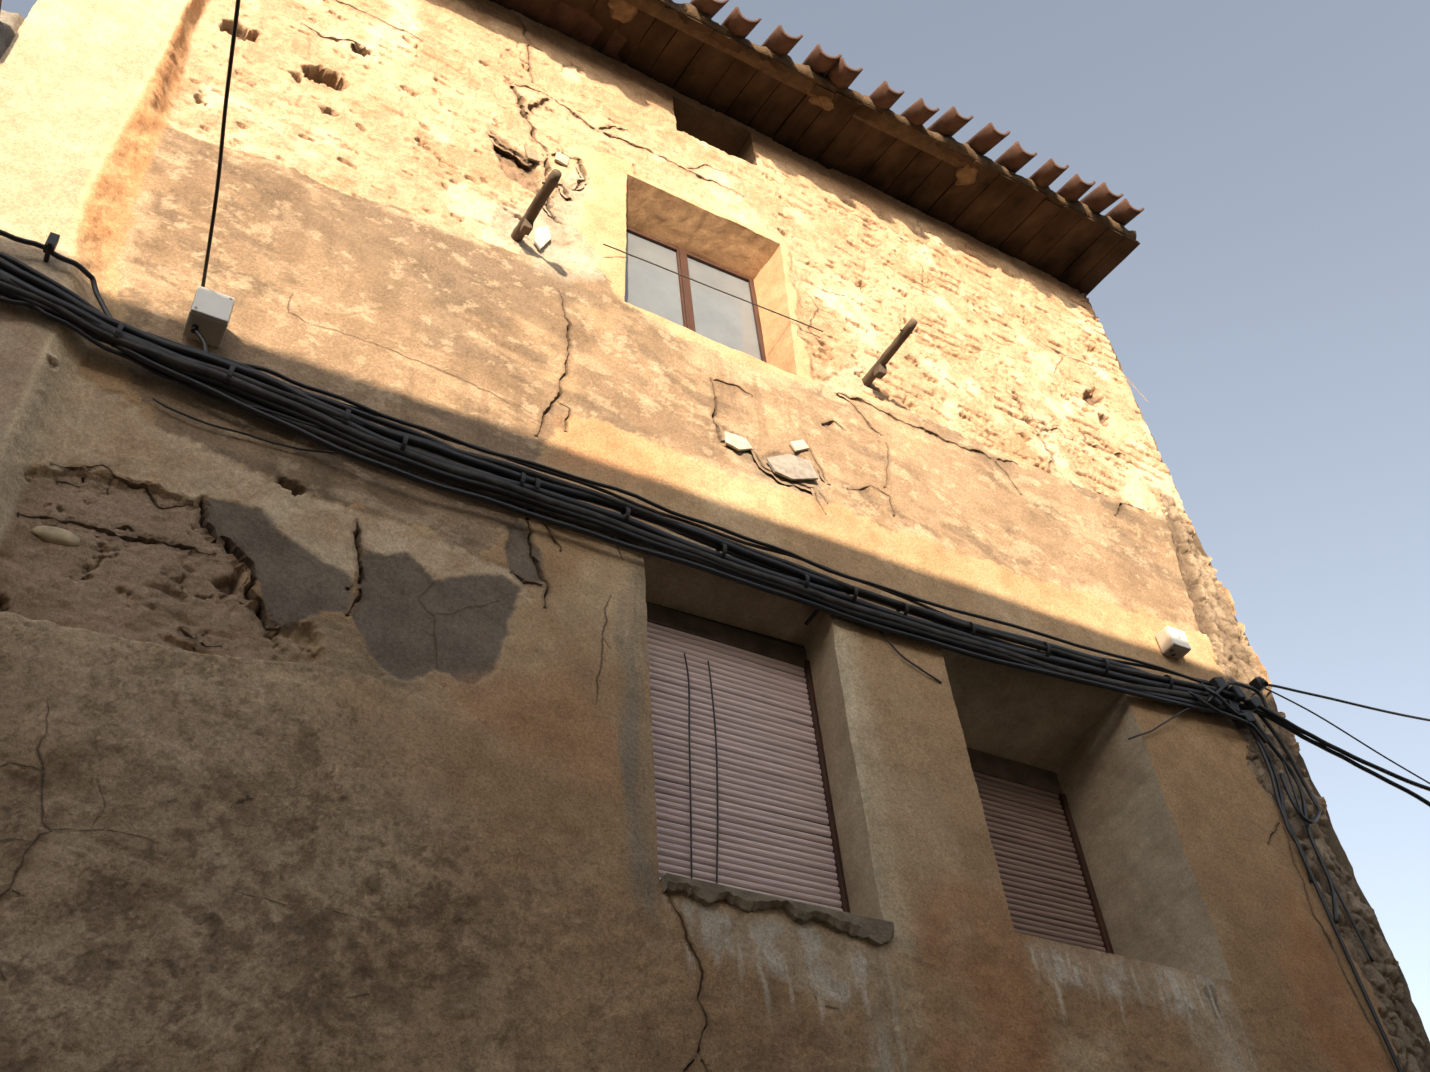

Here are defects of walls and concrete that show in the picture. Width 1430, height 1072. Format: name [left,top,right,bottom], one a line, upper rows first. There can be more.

flaking render [152,0,617,260]
crack [286,292,575,438]
flaking render [0,456,322,665]
crack [343,521,370,618]
crack [417,507,565,668]
flaking render [711,109,1430,1072]
water stain [611,551,910,1072]
crack [662,892,713,1072]